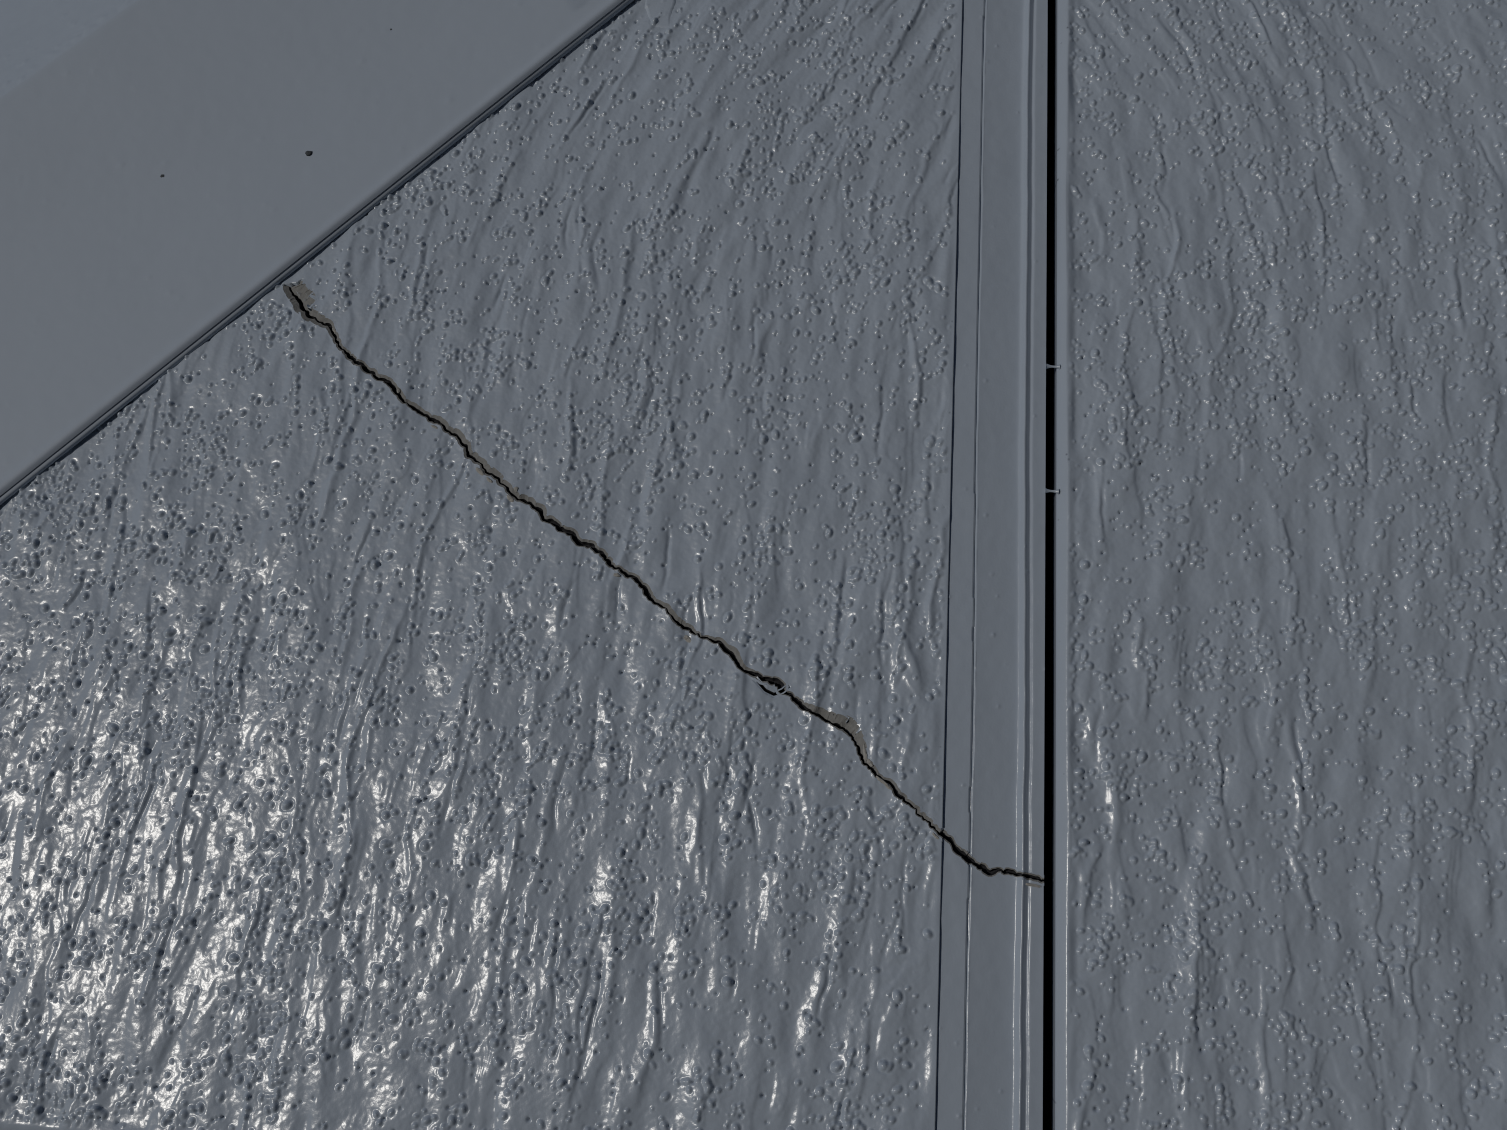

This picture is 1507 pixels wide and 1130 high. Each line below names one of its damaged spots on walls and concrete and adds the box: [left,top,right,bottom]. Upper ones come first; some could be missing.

crack [281,279,1044,888]